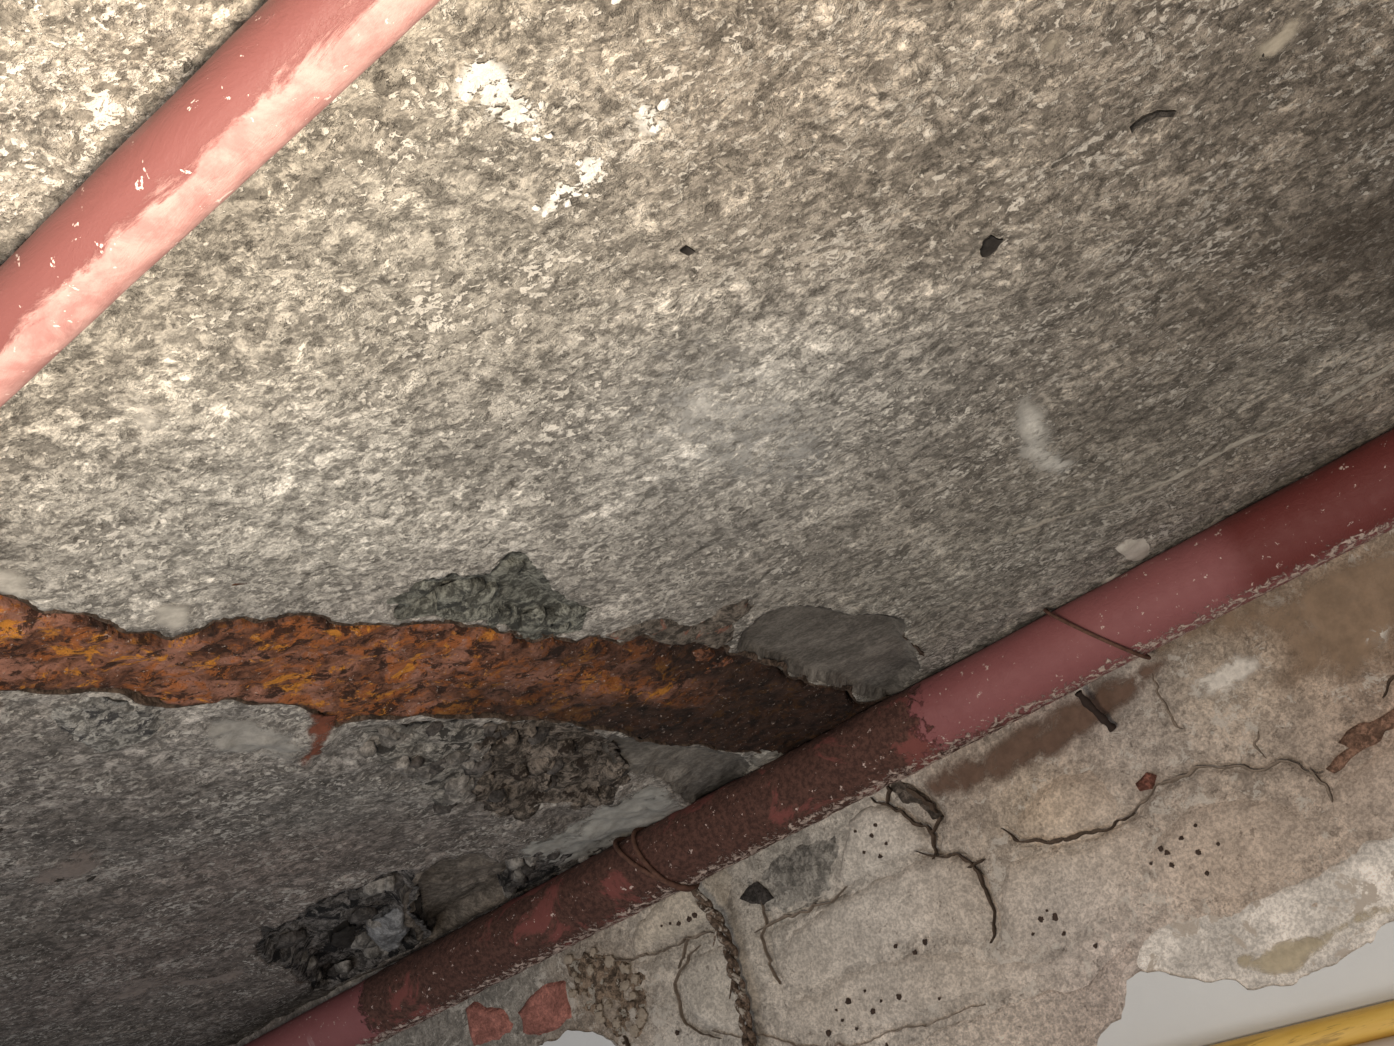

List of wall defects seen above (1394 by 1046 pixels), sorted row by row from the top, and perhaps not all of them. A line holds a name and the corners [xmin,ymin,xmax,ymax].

corrosion [302,715,336,766]
spalling [0,687,762,821]
flaking render [0,551,920,704]
corrosion [692,648,733,674]
flaking render [375,529,1394,1046]
crack [1152,674,1182,729]
crack [1001,732,1333,845]
crack [870,785,997,943]
crack [585,931,984,1046]
crack [754,886,848,984]